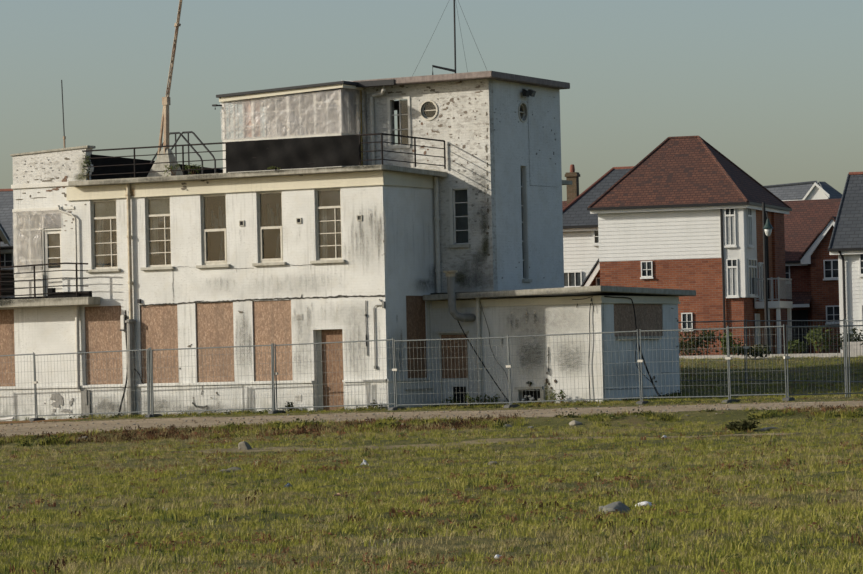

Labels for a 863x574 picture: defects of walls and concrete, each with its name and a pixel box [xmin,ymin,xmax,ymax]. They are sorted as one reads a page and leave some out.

flaking render [16,157,74,231]
peeling [412,82,500,222]